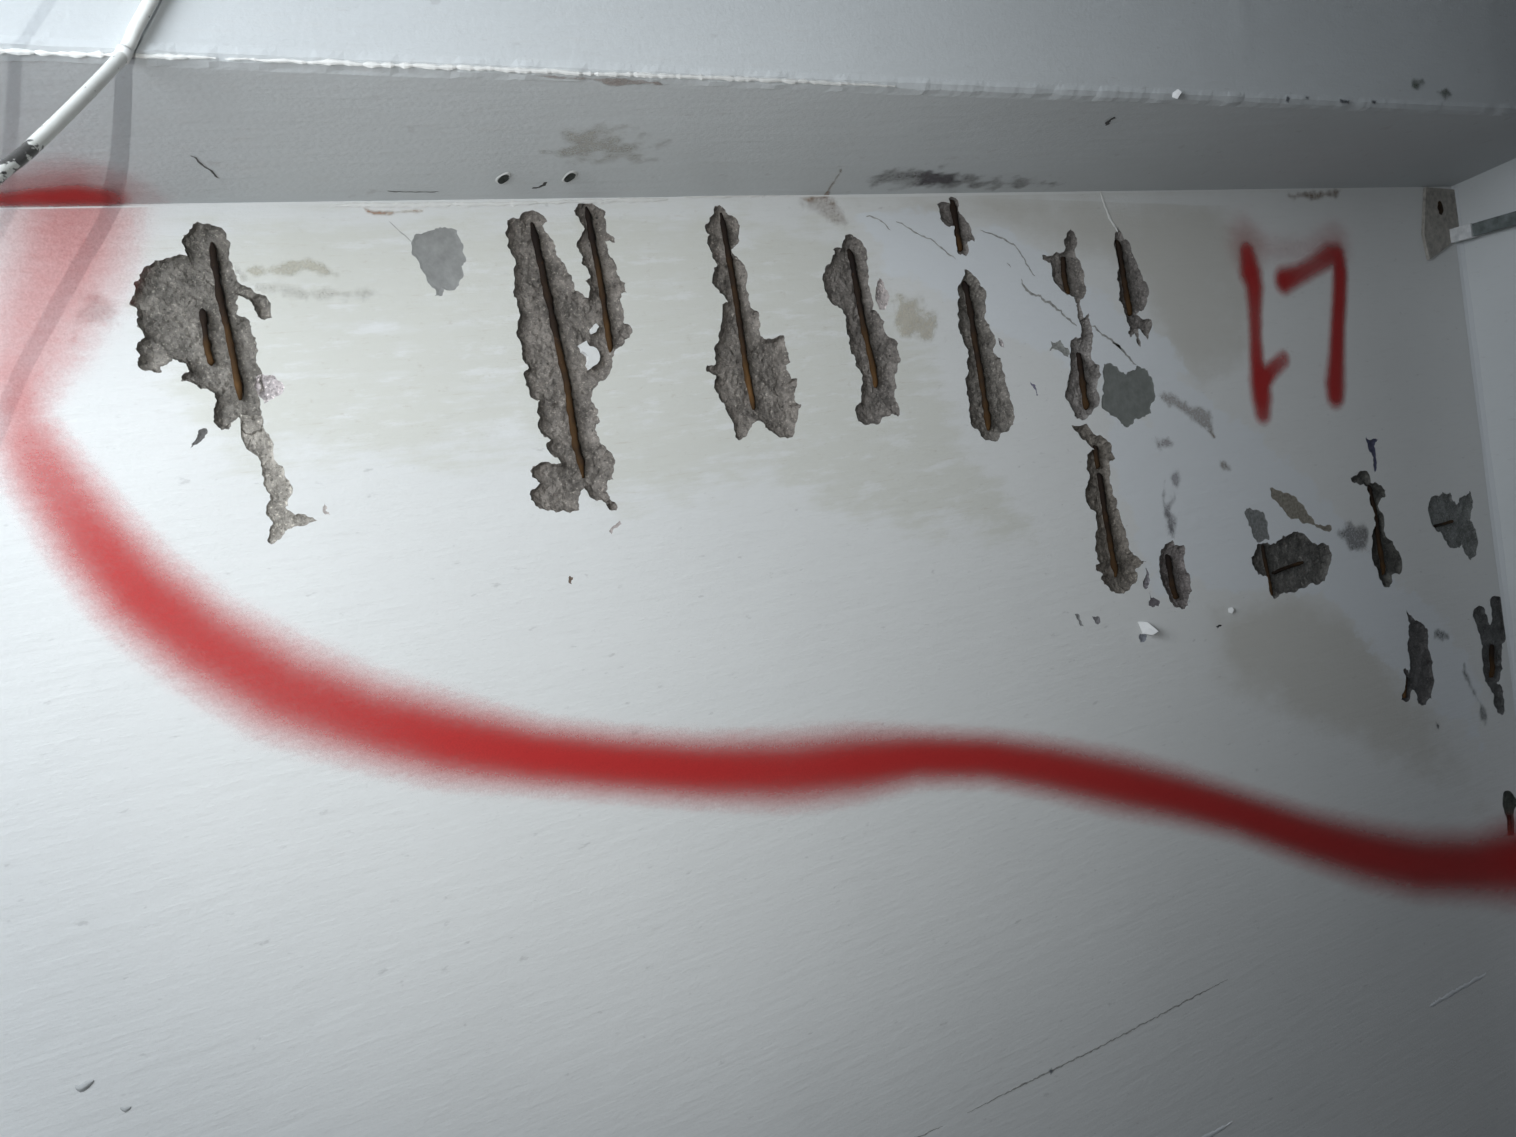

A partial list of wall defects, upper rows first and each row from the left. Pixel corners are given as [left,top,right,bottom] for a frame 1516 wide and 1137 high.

spalling [129,222,330,544]
spalling [505,203,633,534]
spalling [705,205,801,440]
spalling [822,234,901,425]
spalling [937,197,1015,442]
spalling [1042,228,1192,642]
spalling [1244,487,1332,599]
spalling [1351,438,1402,587]
spalling [1401,612,1434,706]
spalling [1473,596,1506,715]